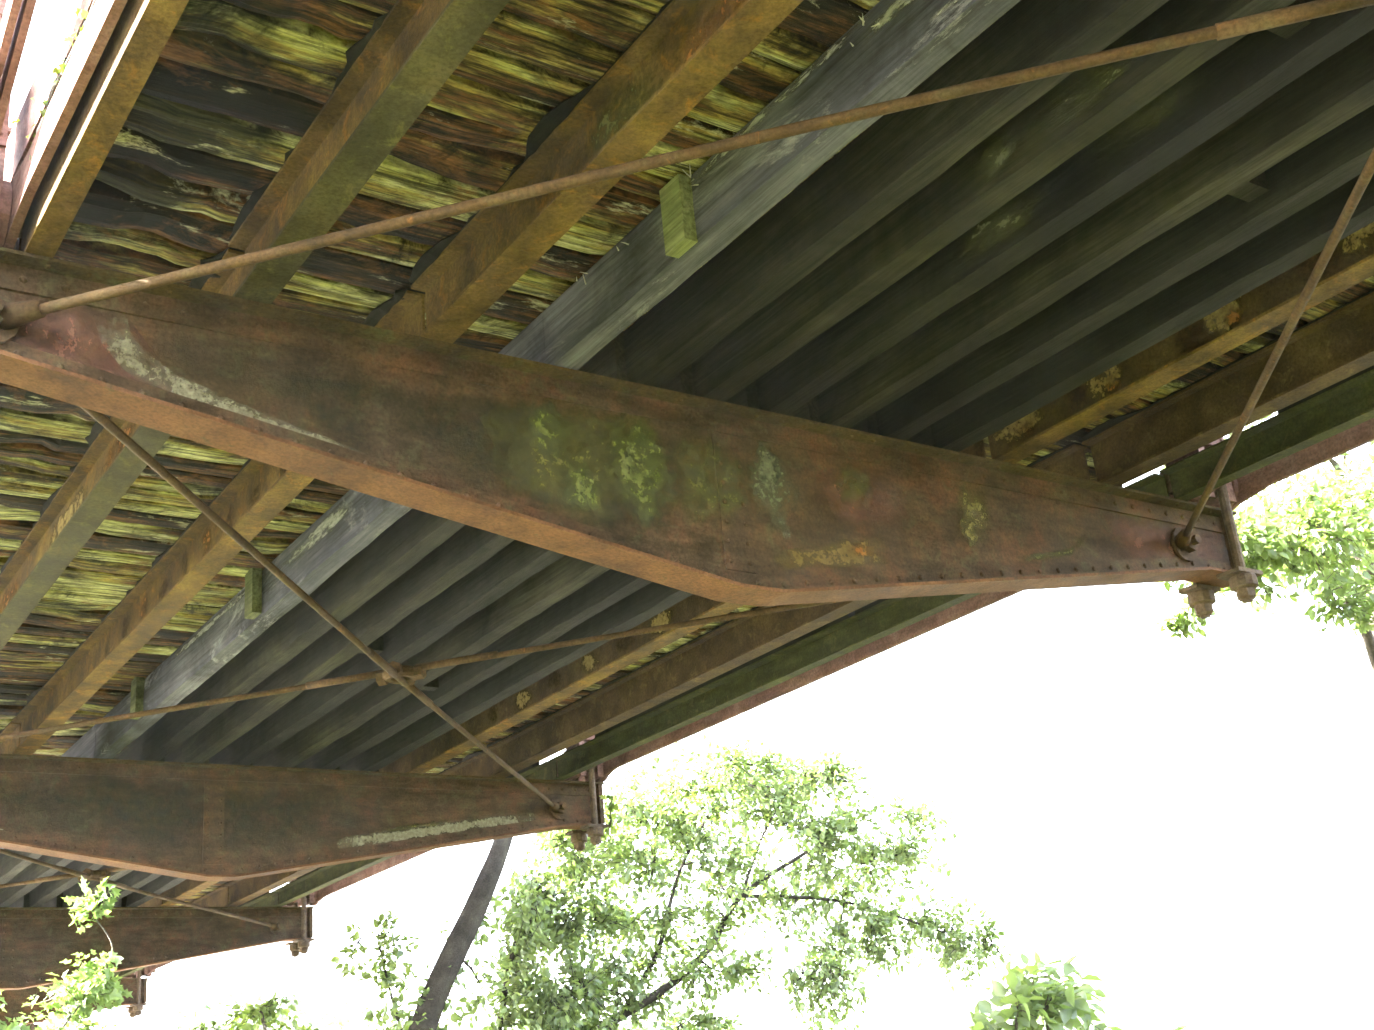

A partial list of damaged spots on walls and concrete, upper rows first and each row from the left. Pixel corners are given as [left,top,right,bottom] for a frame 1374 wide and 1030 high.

water stain [103,320,355,451]
rust [1067,366,1122,408]
rust [975,409,1043,454]
rust [50,487,85,543]
rust [780,539,885,568]